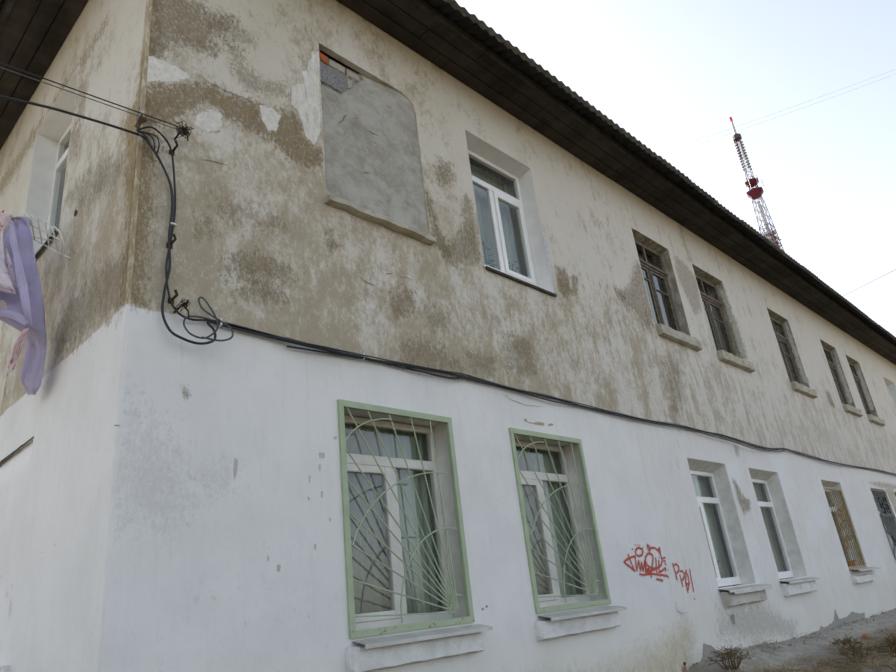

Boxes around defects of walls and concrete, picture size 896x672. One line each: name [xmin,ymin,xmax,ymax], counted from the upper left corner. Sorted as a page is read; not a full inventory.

leakage [117,0,323,309]
leakage [558,269,578,295]